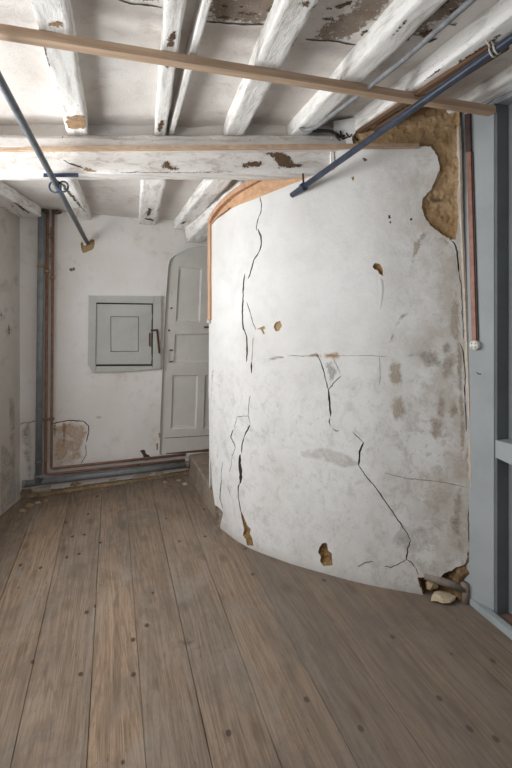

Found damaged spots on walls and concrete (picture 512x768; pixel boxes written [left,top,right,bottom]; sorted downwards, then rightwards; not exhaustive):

peeling [315,0,389,42]
peeling [65,115,86,129]
peeling [243,152,302,169]
spalling [352,107,460,240]
crack [242,196,262,373]
crack [452,241,467,419]
crack [220,397,250,514]
crack [290,355,464,574]
spalling [241,512,253,546]
spalling [318,543,333,566]
spalling [418,552,469,602]